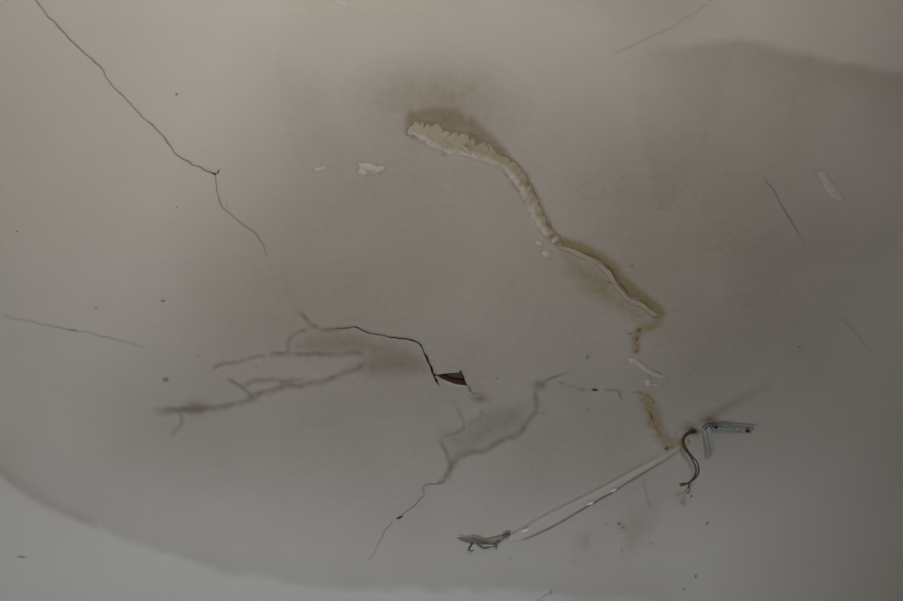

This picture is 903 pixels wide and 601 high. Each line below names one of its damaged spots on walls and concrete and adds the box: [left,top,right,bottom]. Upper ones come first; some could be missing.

crack [36,0,299,311]
peeling [559,247,660,318]
crack [322,326,439,385]
crack [369,475,447,559]